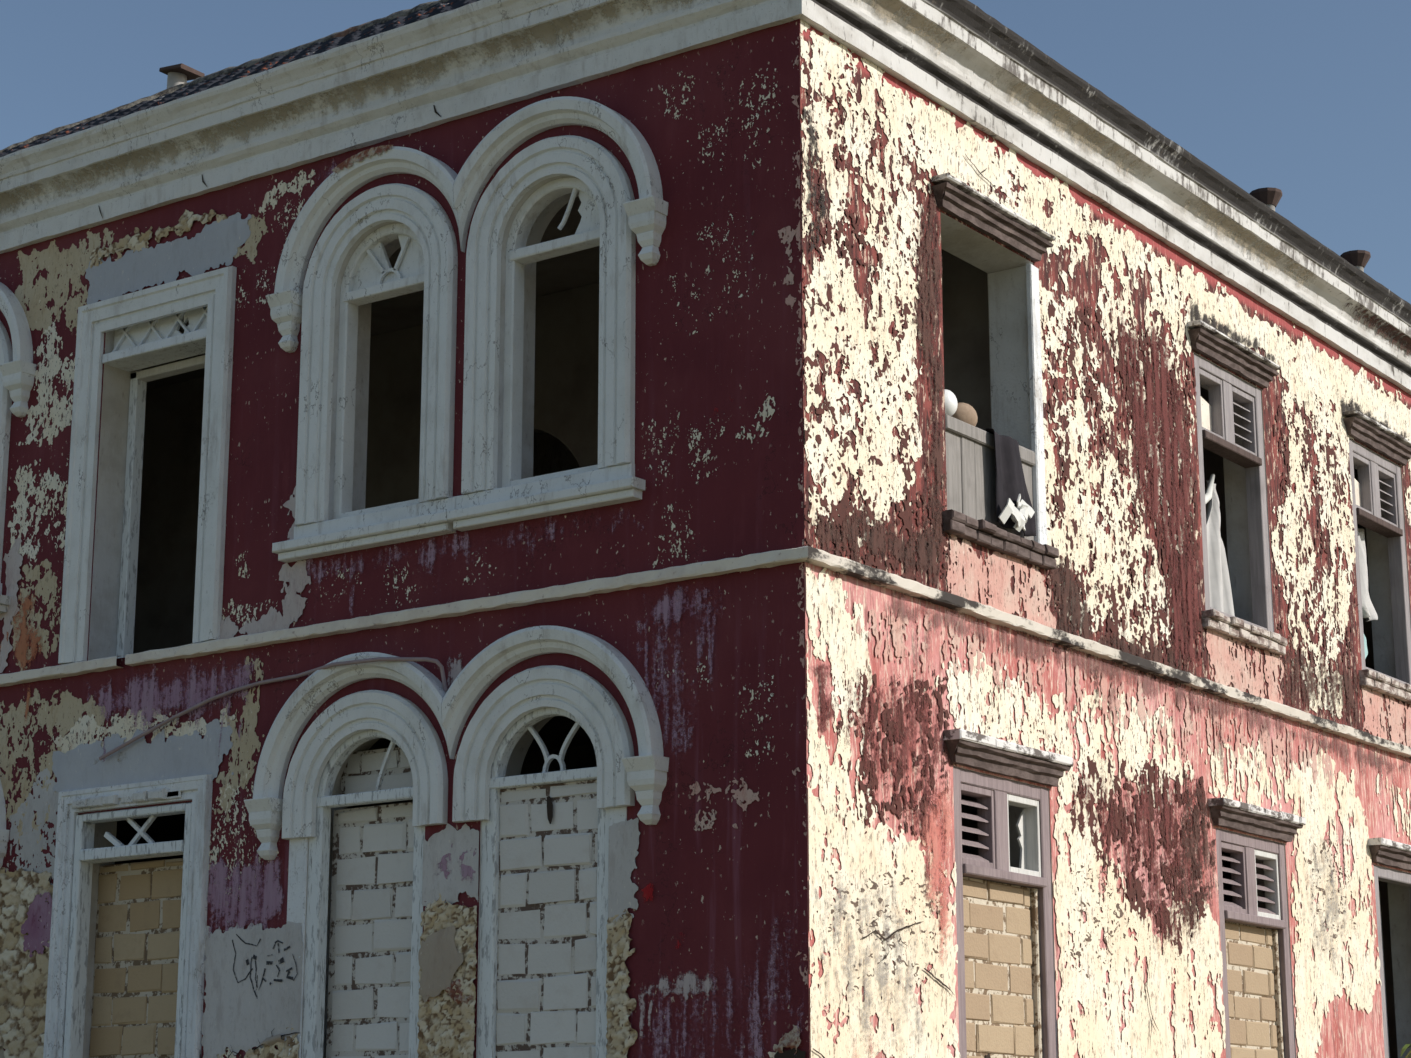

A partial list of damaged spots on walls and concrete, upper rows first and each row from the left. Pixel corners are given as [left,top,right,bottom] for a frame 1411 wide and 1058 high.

peeling [233,169,315,308]
peeling [0,209,228,673]
flaking render [283,486,296,540]
flaking render [220,560,362,639]
peeling [385,566,419,607]
peeling [642,19,1411,1058]
spalling [0,656,279,1058]
flaking render [201,921,303,1058]
spalling [417,823,479,1058]